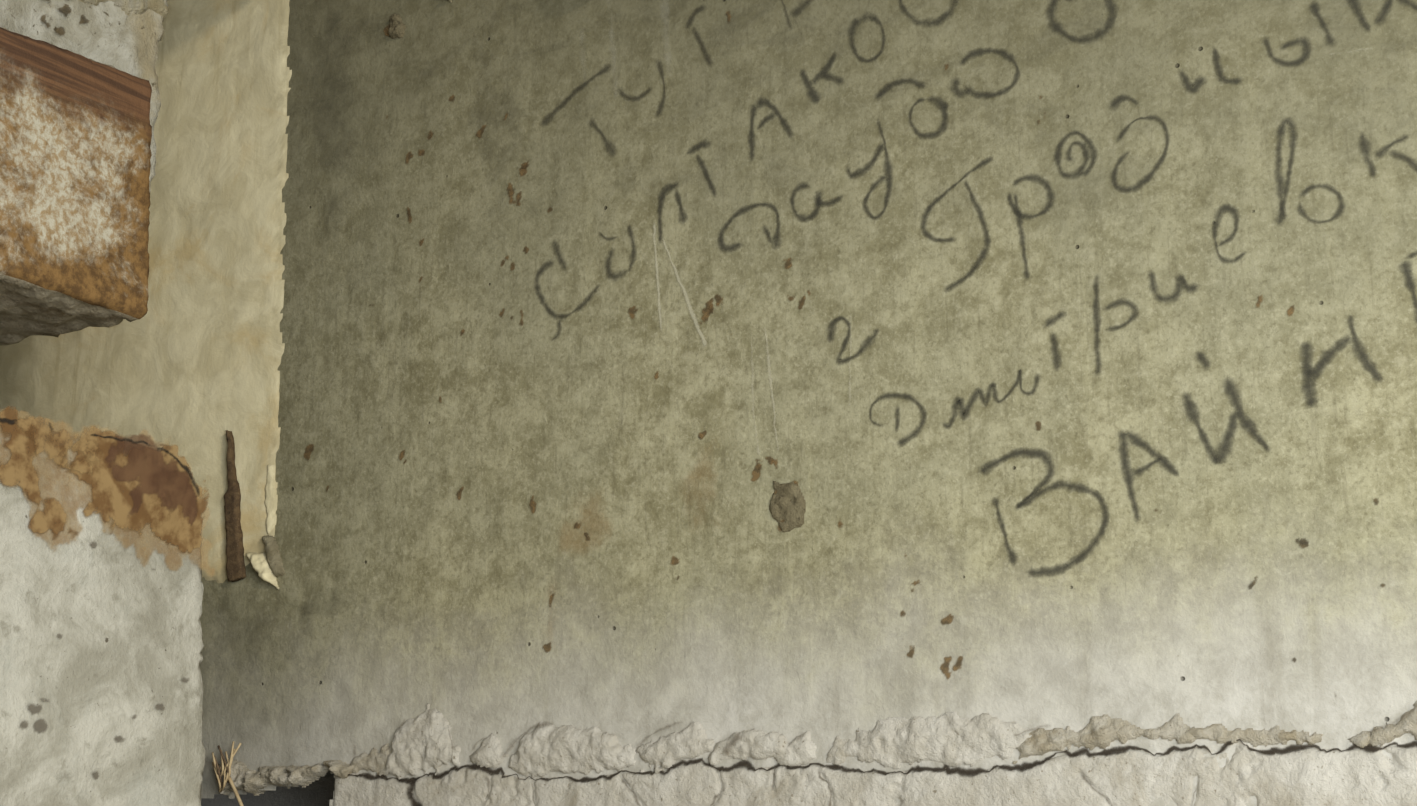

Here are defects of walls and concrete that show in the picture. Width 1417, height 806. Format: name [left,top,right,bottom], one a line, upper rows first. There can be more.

rust [0,406,246,582]
crack [347,737,1417,806]